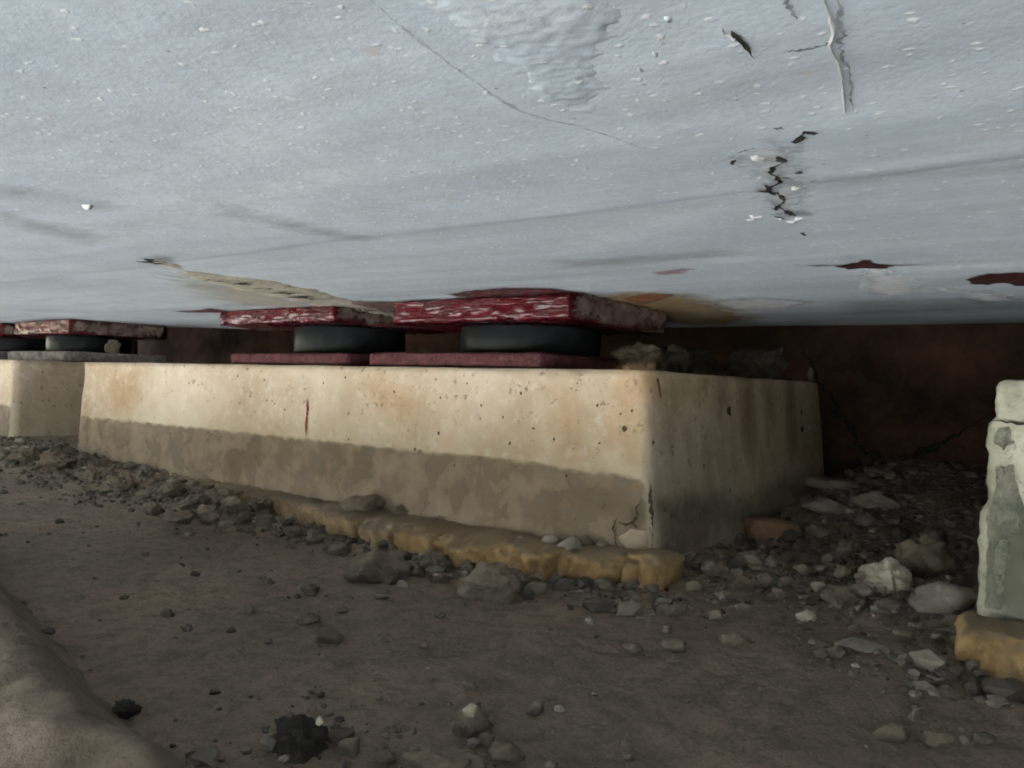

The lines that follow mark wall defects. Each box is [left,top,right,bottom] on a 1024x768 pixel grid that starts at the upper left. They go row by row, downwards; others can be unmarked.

crack [730,127,819,236]
peeling [135,258,378,310]
rust [836,260,897,270]
rust [966,272,1024,286]
spalling [989,420,1024,451]
leakage [78,400,646,550]
crack [612,484,654,549]
spalling [985,464,1024,609]